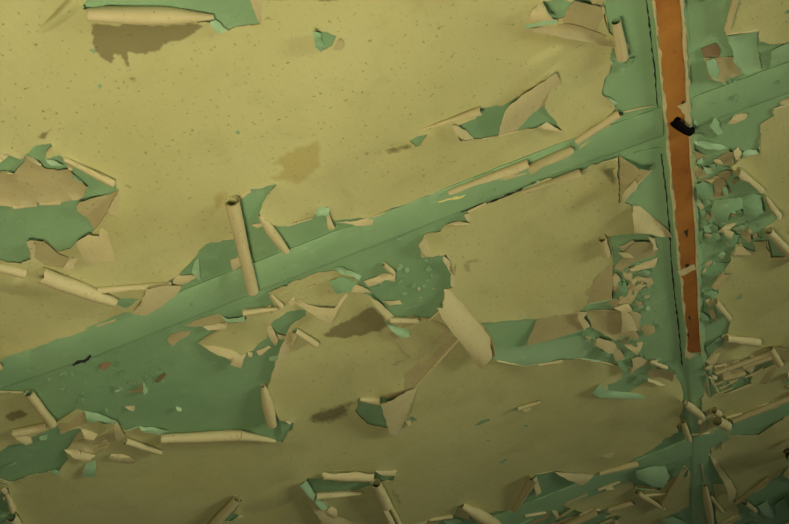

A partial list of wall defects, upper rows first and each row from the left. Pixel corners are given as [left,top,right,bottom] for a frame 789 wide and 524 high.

peeling [82,0,262,34]
peeling [410,73,563,146]
peeling [437,146,574,203]
peeling [0,143,122,279]
peeling [481,0,789,476]
peeling [0,184,492,481]
peeling [300,470,402,524]
peeling [414,503,505,524]
peeling [512,471,596,512]
peeling [517,493,634,524]
peeling [630,456,691,511]
peeling [700,440,789,524]